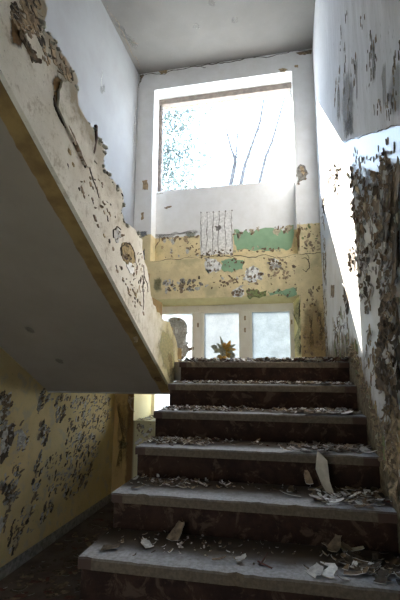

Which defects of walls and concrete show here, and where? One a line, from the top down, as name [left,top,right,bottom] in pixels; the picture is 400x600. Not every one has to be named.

spalling [10,0,79,91]
peeling [334,42,356,107]
peeling [366,30,377,86]
peeling [373,40,400,121]
flaking render [296,164,308,185]
flaking render [78,164,146,315]
peeling [161,235,297,298]
peeling [301,137,400,517]
peeling [0,388,111,556]